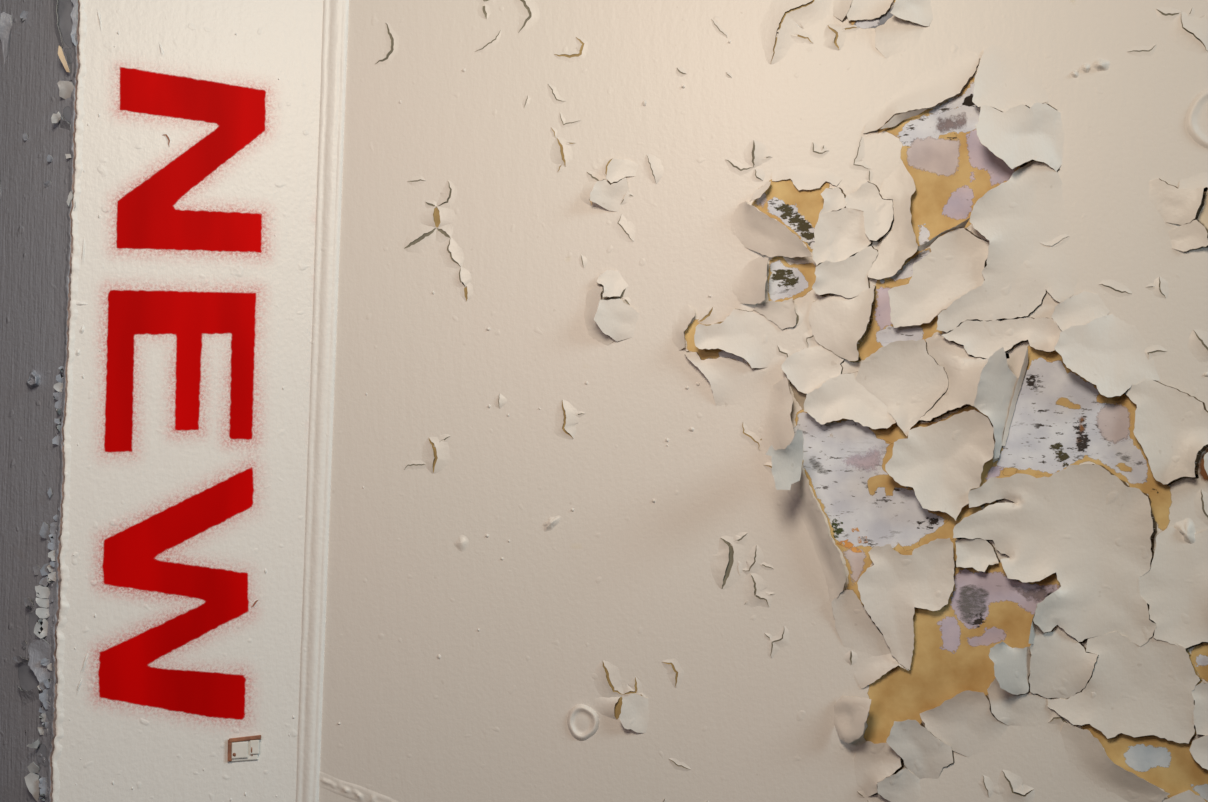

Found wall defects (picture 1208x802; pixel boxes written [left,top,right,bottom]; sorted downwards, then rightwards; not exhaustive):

crack [475,0,540,53]
peeling [833,0,933,59]
crack [404,175,473,301]
peeling [672,44,1208,802]
peeling [13,514,59,802]